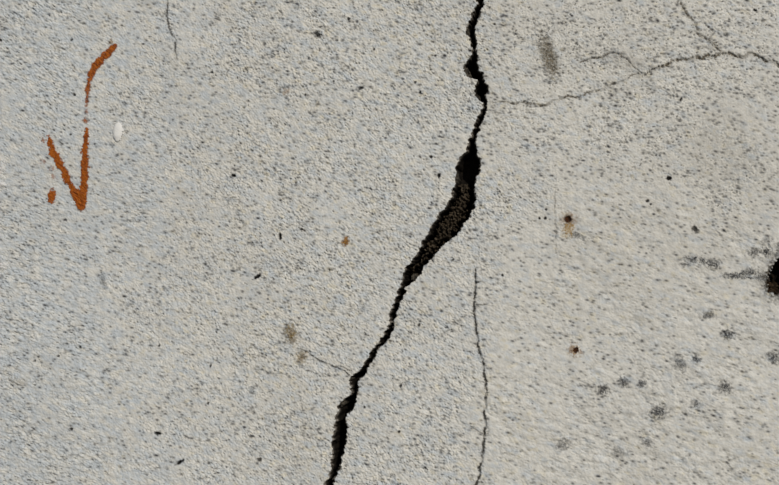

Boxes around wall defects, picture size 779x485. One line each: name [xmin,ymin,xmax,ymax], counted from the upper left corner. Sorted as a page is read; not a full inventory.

crack [564,3,779,98]
crack [311,0,547,485]
spalling [763,256,779,299]